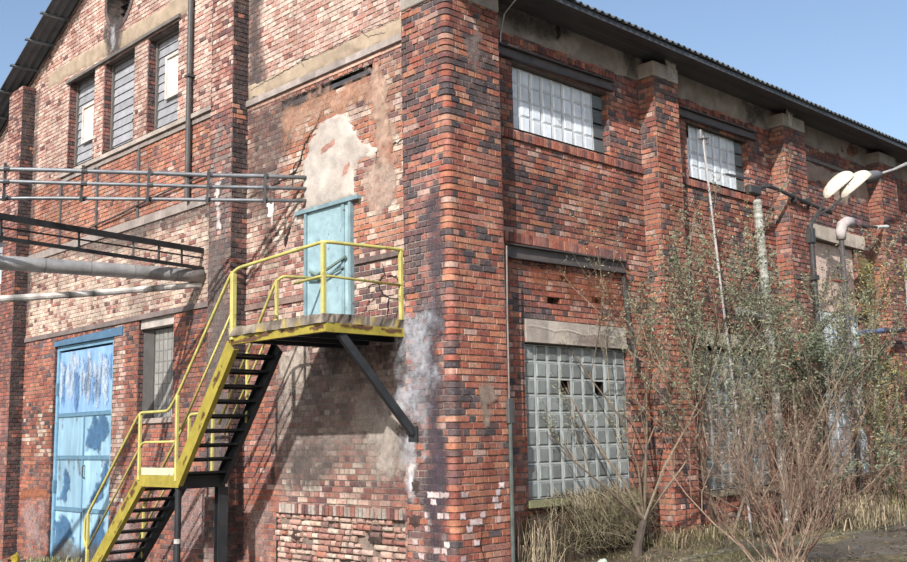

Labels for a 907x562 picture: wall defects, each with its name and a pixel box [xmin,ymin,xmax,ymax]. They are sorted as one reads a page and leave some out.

leakage [103,17,122,56]
crack [250,110,322,198]
peeling [282,62,403,219]